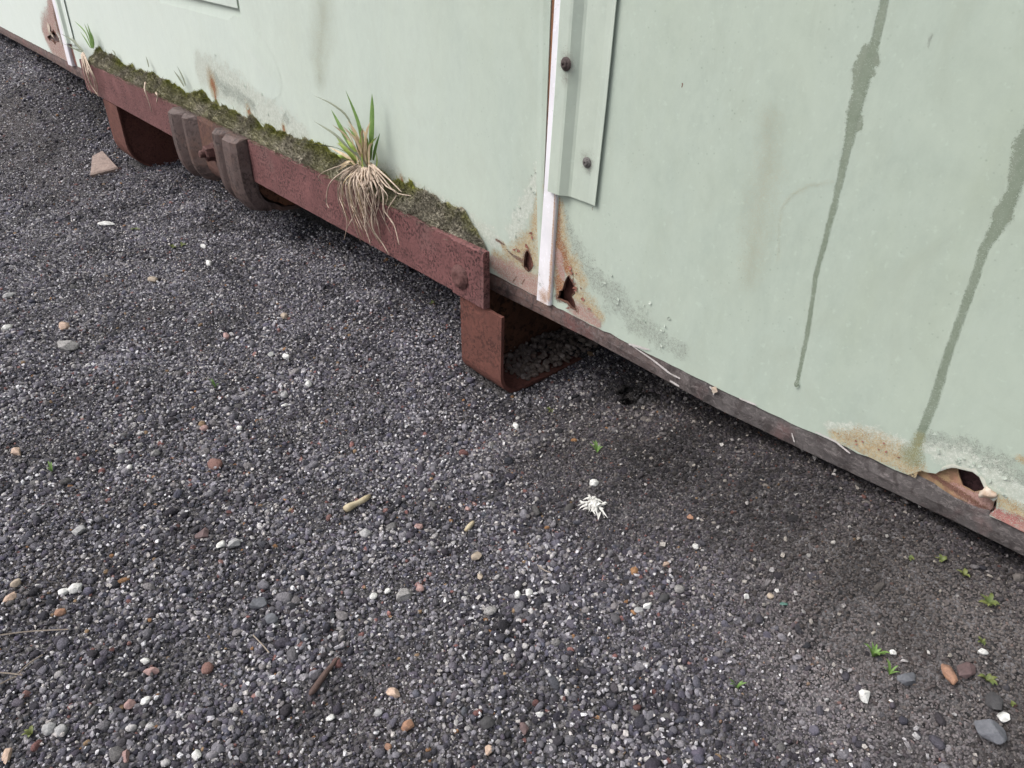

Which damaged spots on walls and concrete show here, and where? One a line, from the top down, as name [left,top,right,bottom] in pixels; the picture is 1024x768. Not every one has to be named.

corrosion [205,66,220,104]
corrosion [490,189,605,328]
peeling [560,201,689,361]
water stain [776,0,889,387]
water stain [897,125,1024,470]
peeling [823,419,1024,509]
corrosion [826,425,1024,532]